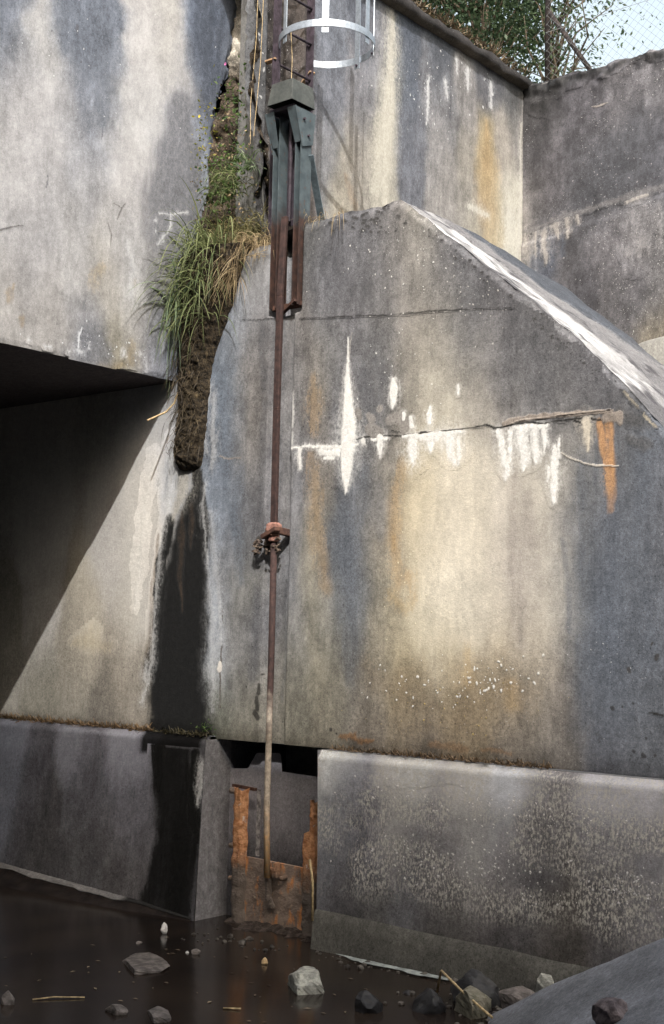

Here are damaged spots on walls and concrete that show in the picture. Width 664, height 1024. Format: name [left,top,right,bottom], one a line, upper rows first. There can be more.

crack [356,408,612,440]
corrosion [597,422,614,491]
leakage [291,335,476,696]
leakage [129,317,273,921]
leakage [279,581,288,706]
leakage [320,764,479,803]
leakage [525,806,571,885]